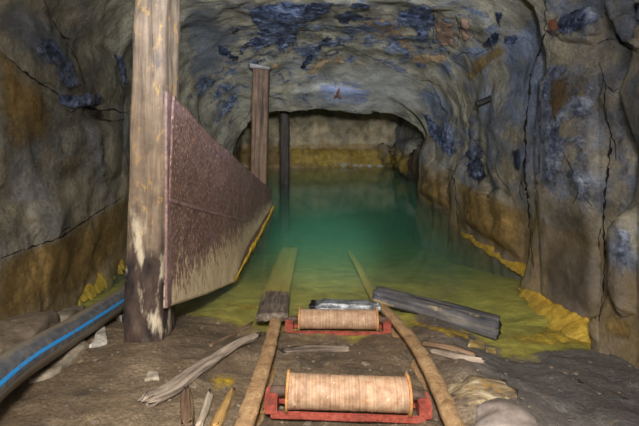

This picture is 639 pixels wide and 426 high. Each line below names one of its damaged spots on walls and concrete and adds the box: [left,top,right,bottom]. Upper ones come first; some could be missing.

crack [1,52,59,96]
crack [65,106,128,122]
crack [454,0,560,268]
crack [573,62,618,321]
crack [1,196,124,258]
damp [0,216,118,313]
damp [516,285,593,346]